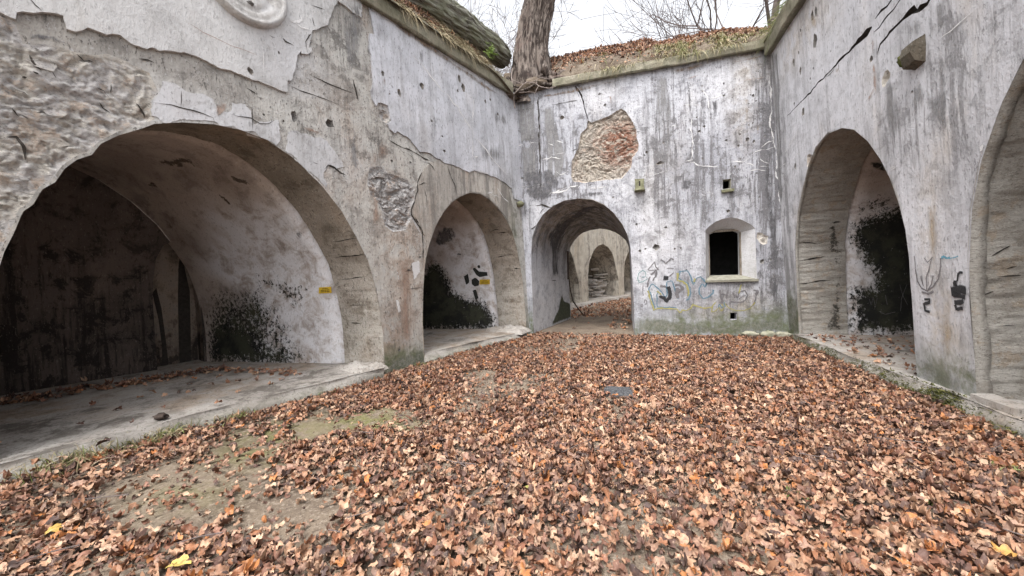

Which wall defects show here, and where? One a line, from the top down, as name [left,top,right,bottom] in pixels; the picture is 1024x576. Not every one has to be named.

crack [787,0,930,116]
spalling [0,16,158,250]
flaking render [571,109,639,183]
spalling [367,166,422,236]
mould [204,275,316,363]
damp [412,260,497,329]
mould [827,195,914,335]